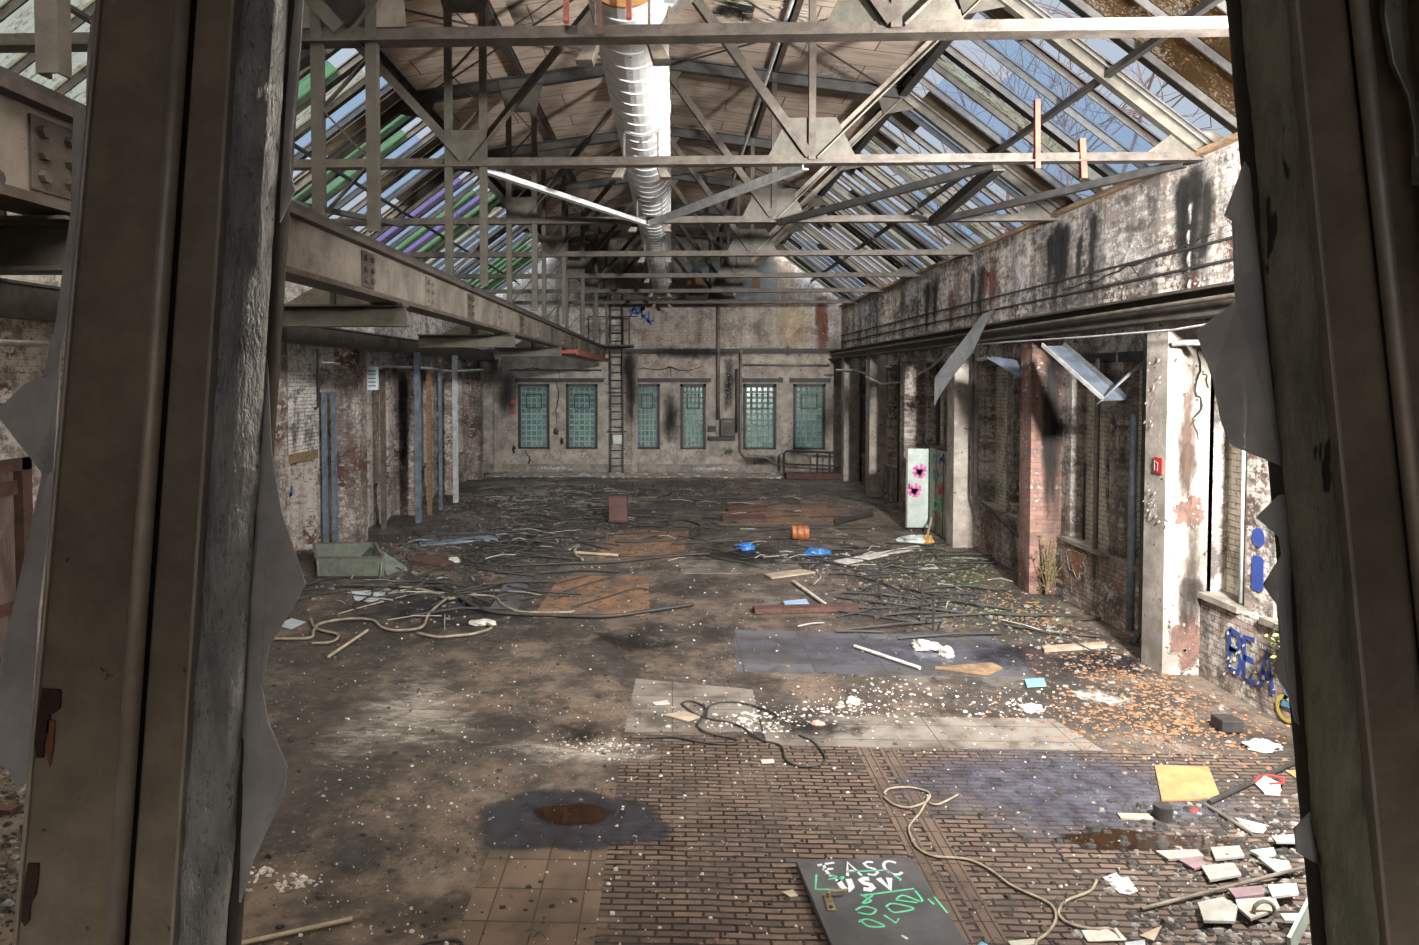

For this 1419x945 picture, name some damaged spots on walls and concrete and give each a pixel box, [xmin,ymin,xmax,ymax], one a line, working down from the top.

water stain [1014,255,1028,308]
water stain [1047,213,1139,300]
water stain [1176,166,1214,288]
water stain [624,354,636,418]